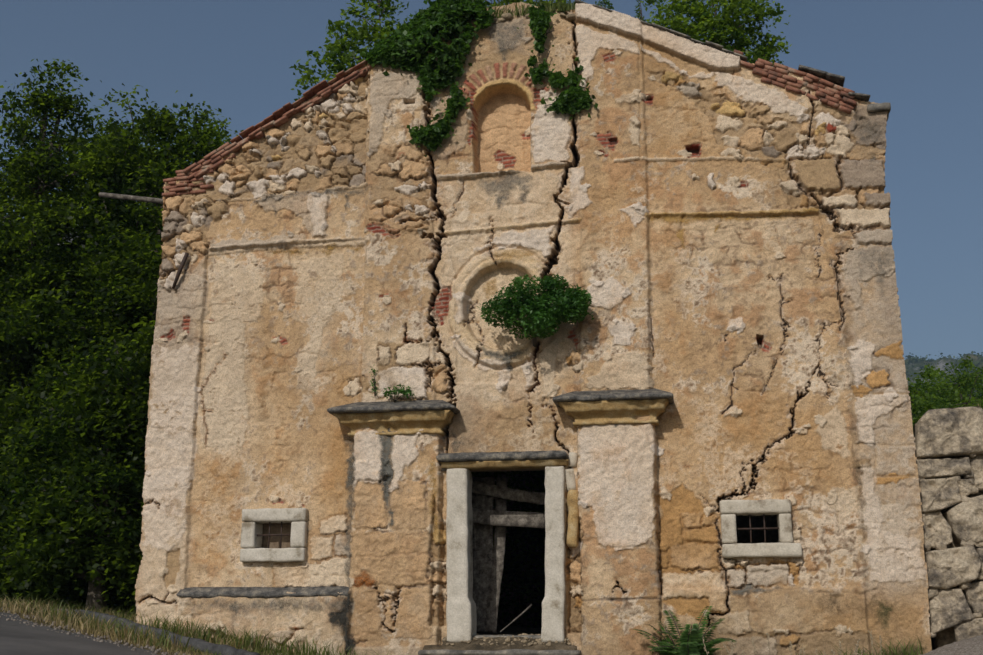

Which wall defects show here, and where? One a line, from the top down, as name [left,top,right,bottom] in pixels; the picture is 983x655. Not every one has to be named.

crack [423,95,431,125]
crack [541,117,580,280]
crack [565,10,579,85]
spalling [575,24,891,258]
crack [805,90,816,145]
spalling [138,15,596,652]
crack [402,153,464,450]
crack [465,304,484,357]
crack [528,341,560,444]
crack [706,162,854,627]